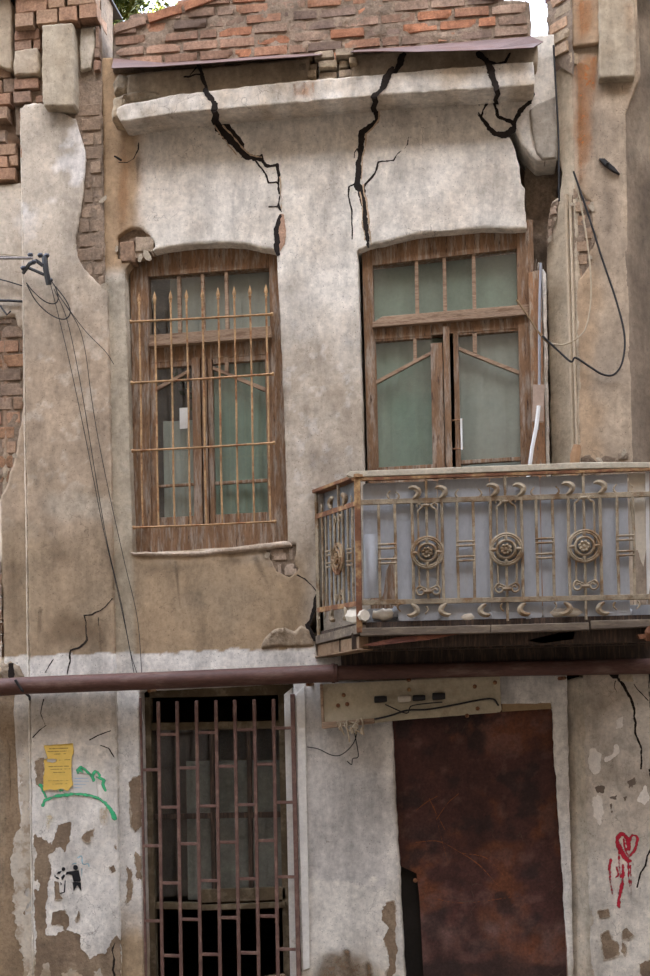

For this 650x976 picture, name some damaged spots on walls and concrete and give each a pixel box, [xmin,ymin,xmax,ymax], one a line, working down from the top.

spalling [0,68,21,184]
spalling [73,93,157,290]
crack [183,64,282,212]
crack [348,52,409,248]
crack [476,51,535,138]
spalling [0,317,24,499]
crack [45,598,113,674]
crack [610,674,650,776]
peeling [10,757,122,976]
crack [636,850,650,888]
peeling [382,900,398,976]
peeling [600,927,634,961]